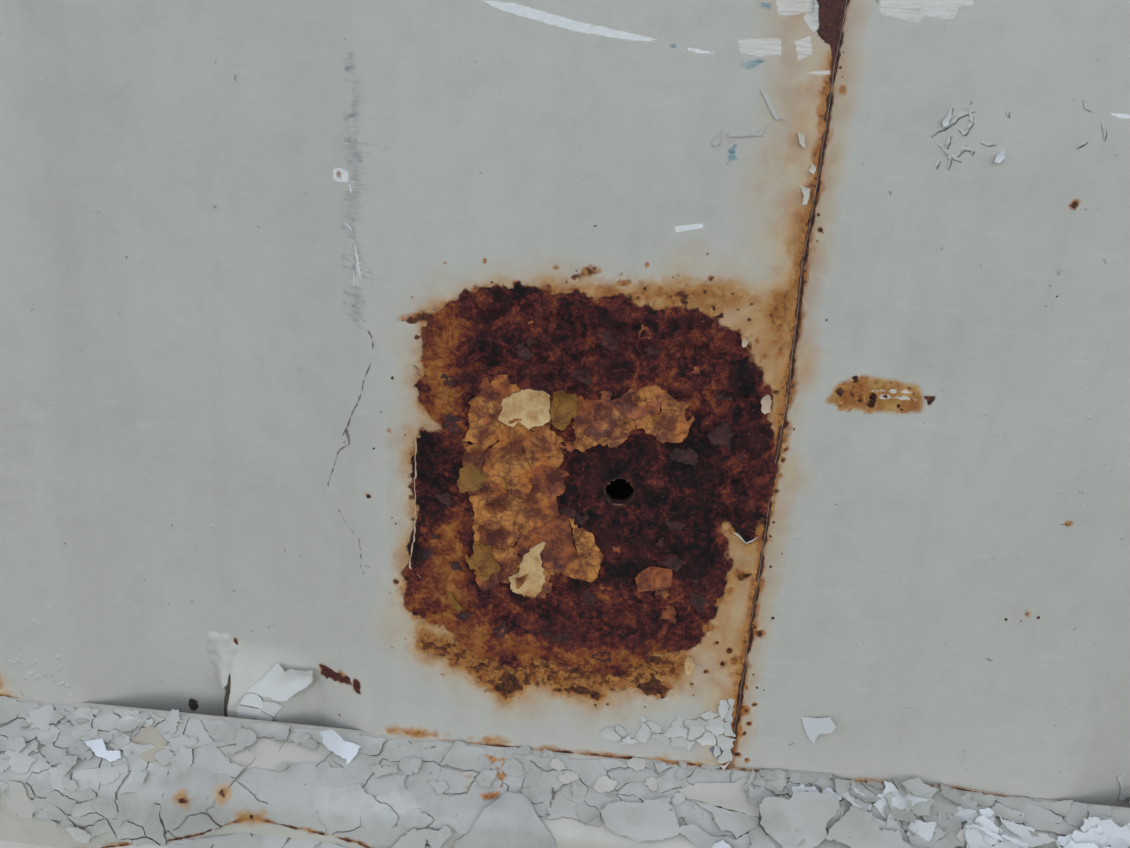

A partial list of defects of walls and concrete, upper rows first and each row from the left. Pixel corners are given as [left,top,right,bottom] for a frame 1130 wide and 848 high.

crack [327,330,374,574]
rust [385,0,851,772]
rust [827,375,936,414]
rust [318,664,361,694]
peeling [0,663,1130,848]
rust [470,737,702,800]